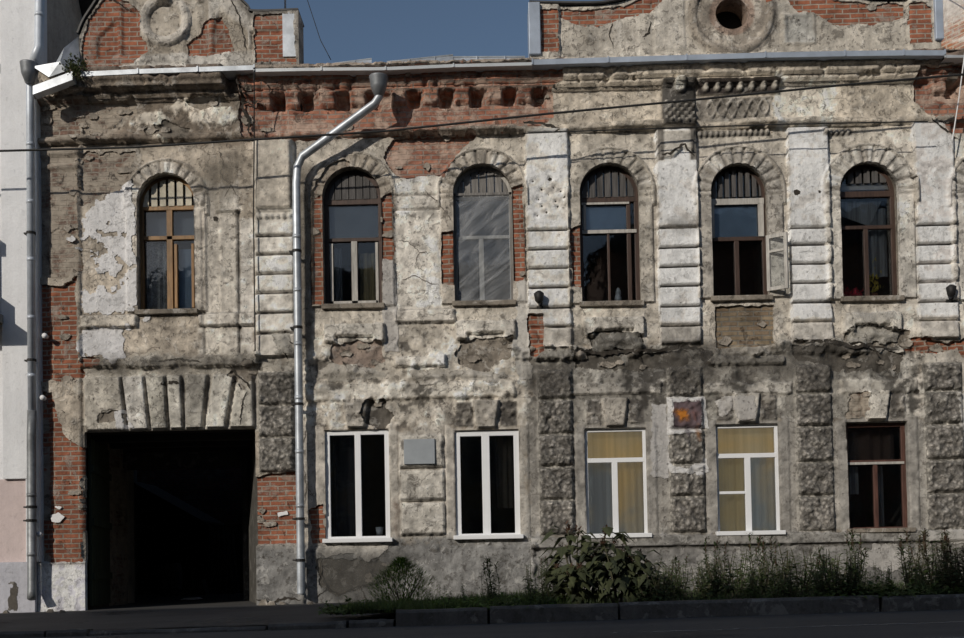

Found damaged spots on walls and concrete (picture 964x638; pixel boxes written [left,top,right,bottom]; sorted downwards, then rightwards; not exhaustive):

flaking render [82,0,148,67]
flaking render [788,0,933,44]
flaking render [186,0,662,179]
flaking render [34,91,138,563]
spalling [454,335,514,372]
flaking render [527,314,544,357]
flaking render [715,305,775,349]
spalling [791,329,964,374]
spalling [359,398,394,429]
flaking render [257,471,296,545]
flaking render [309,504,325,544]
peeling [8,582,18,611]